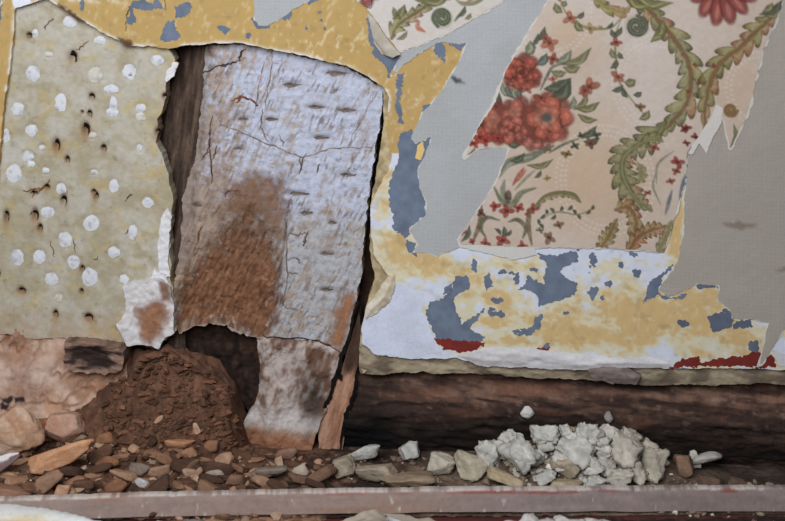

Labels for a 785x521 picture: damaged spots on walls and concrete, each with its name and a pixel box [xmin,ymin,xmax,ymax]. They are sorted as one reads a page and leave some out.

crack [203,49,246,74]
peeling [433,42,465,63]
spalling [0,0,192,349]
crack [201,54,375,221]
peeling [366,18,431,257]
water stain [135,178,286,344]
spalling [187,323,260,410]
peeling [363,249,579,359]
peeling [587,280,613,301]
peeling [643,264,687,303]
peeling [669,340,785,369]
peeling [707,308,753,332]